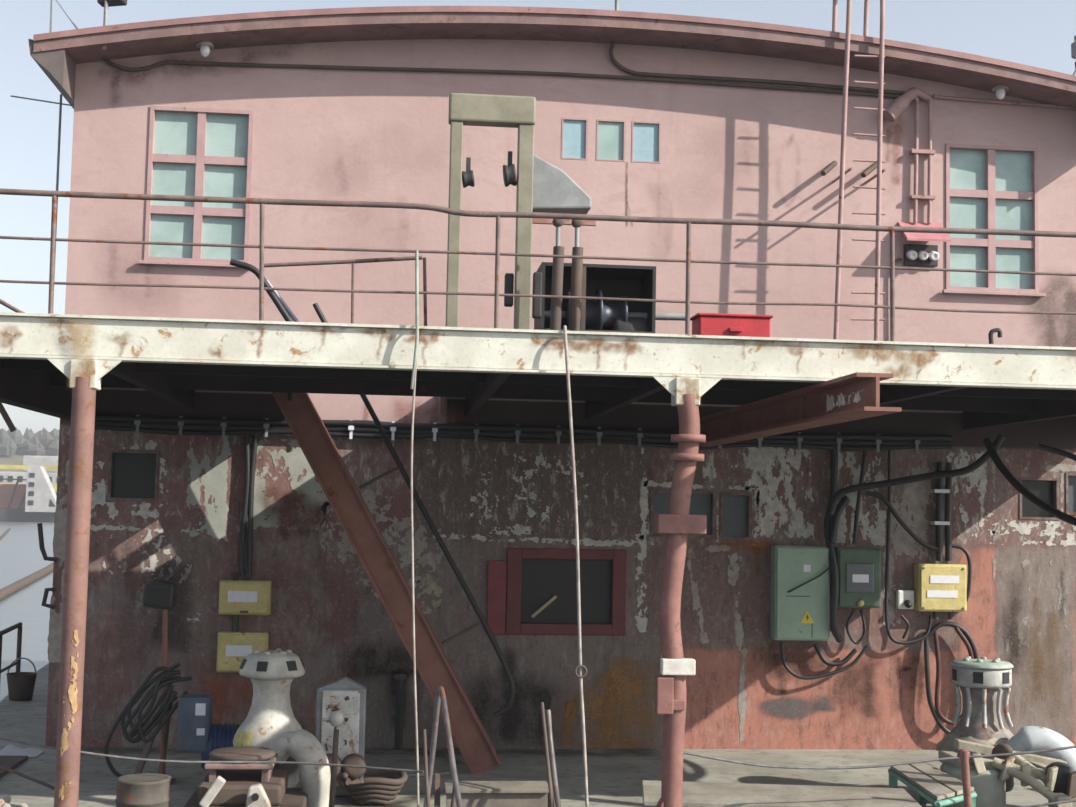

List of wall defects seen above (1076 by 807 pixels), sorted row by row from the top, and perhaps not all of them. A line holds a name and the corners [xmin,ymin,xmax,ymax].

rust [550,338,637,367]
rust [856,344,933,376]
peeling [90,436,379,626]
peeling [361,448,672,633]
peeling [692,447,815,542]
peeling [829,449,1076,631]
peeling [686,549,709,644]
peeling [705,501,748,742]
peeling [762,697,831,718]